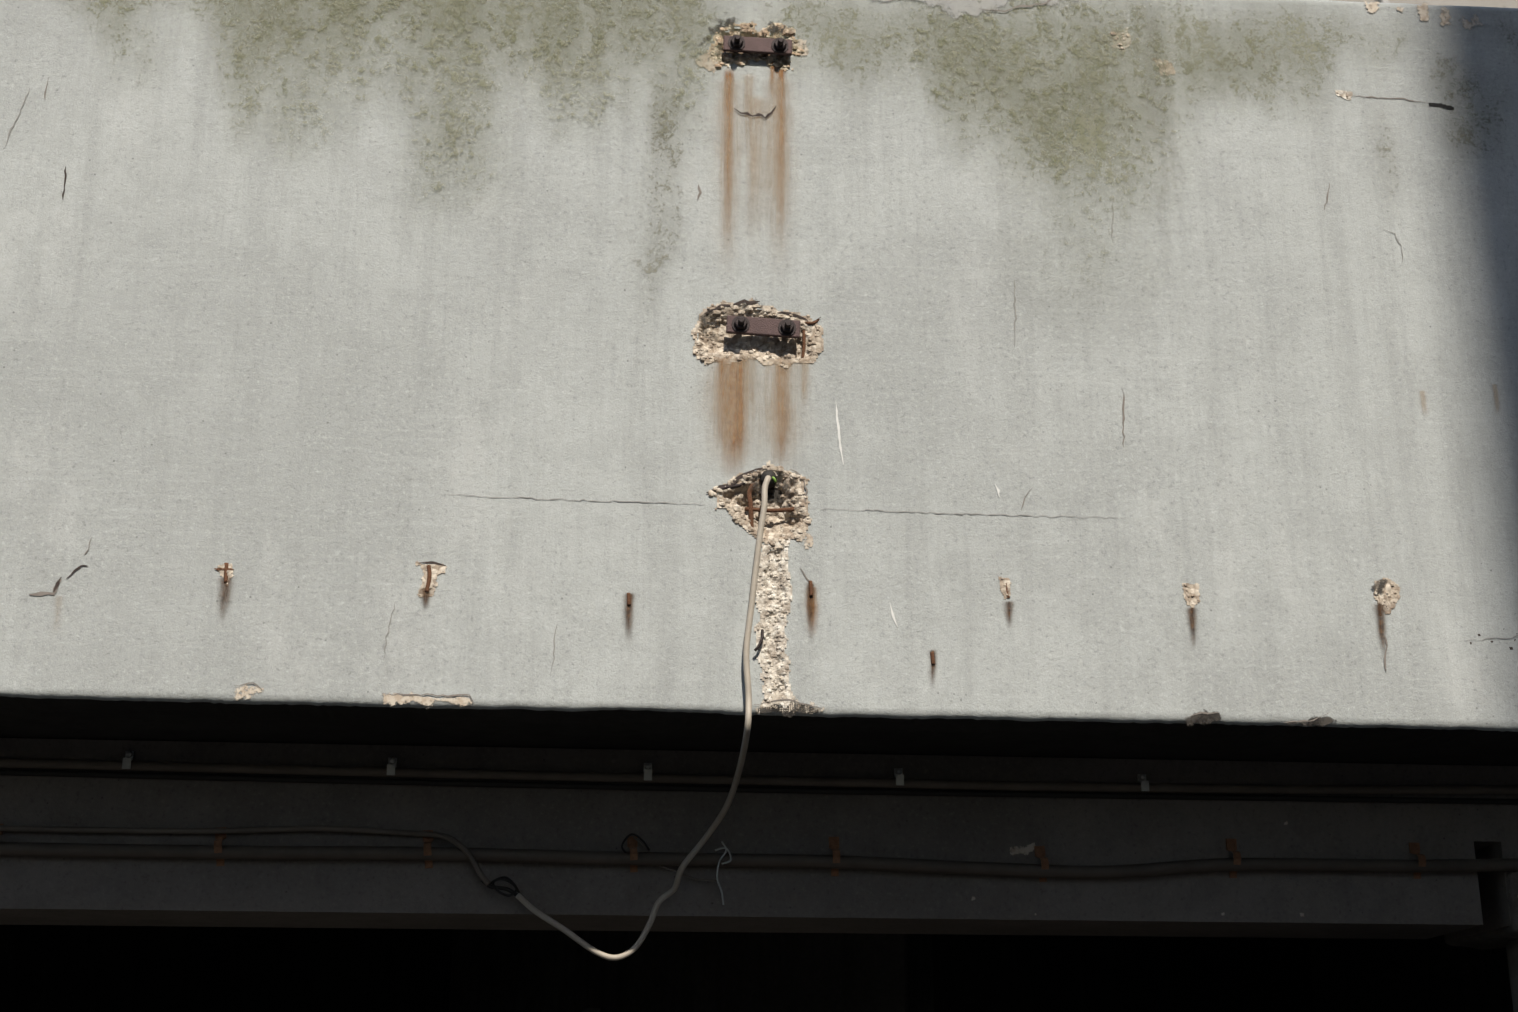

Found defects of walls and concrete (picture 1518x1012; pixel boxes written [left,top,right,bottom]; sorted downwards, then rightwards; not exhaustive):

spalling [696,17,808,73]
corrosion [725,72,733,190]
corrosion [771,62,784,171]
spalling [691,298,824,370]
corrosion [719,360,744,452]
spalling [706,460,825,718]